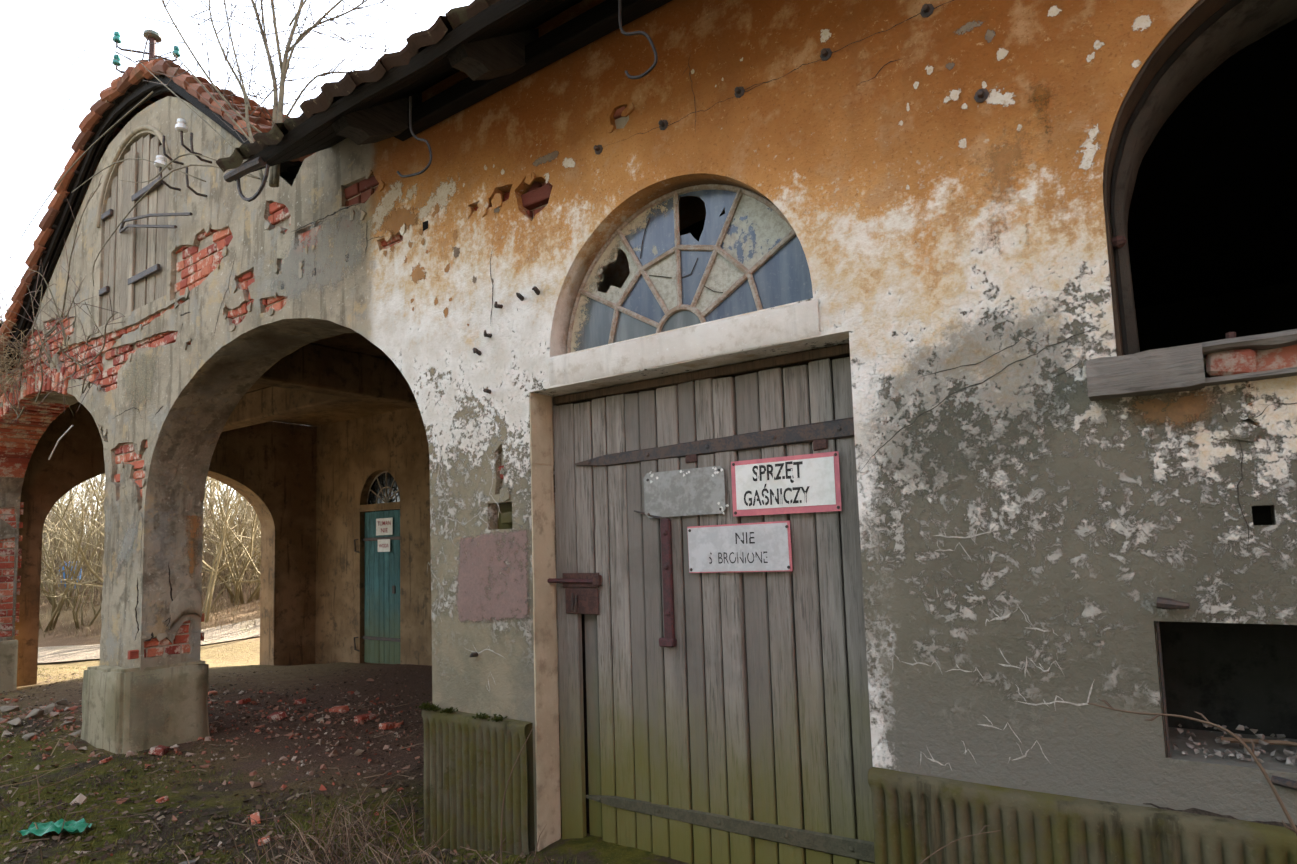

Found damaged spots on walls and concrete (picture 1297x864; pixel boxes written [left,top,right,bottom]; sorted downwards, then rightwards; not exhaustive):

spalling [1215,420,1262,442]